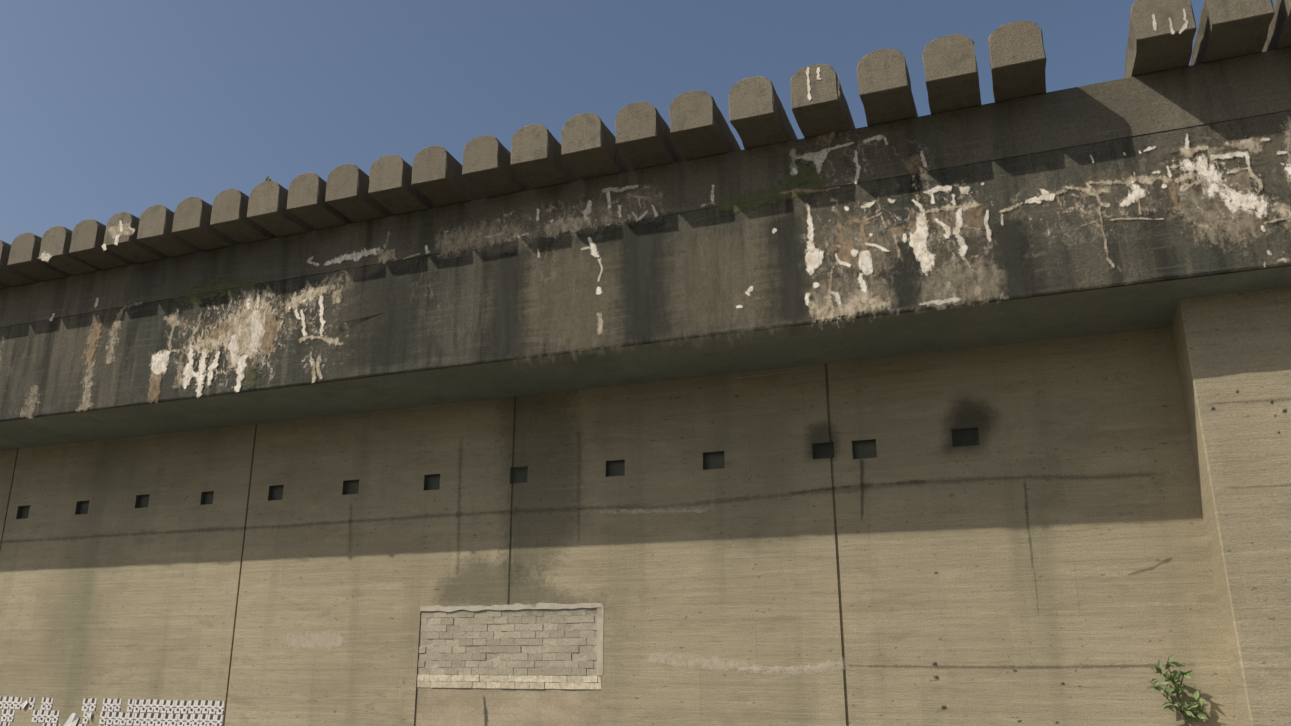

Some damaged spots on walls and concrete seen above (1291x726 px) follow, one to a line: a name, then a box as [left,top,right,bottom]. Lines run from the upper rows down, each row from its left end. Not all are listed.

spalling [439,185,662,256]
spalling [789,131,854,176]
damp [1087,124,1291,234]
spalling [148,287,285,402]
damp [610,217,670,339]
spalling [804,269,891,321]